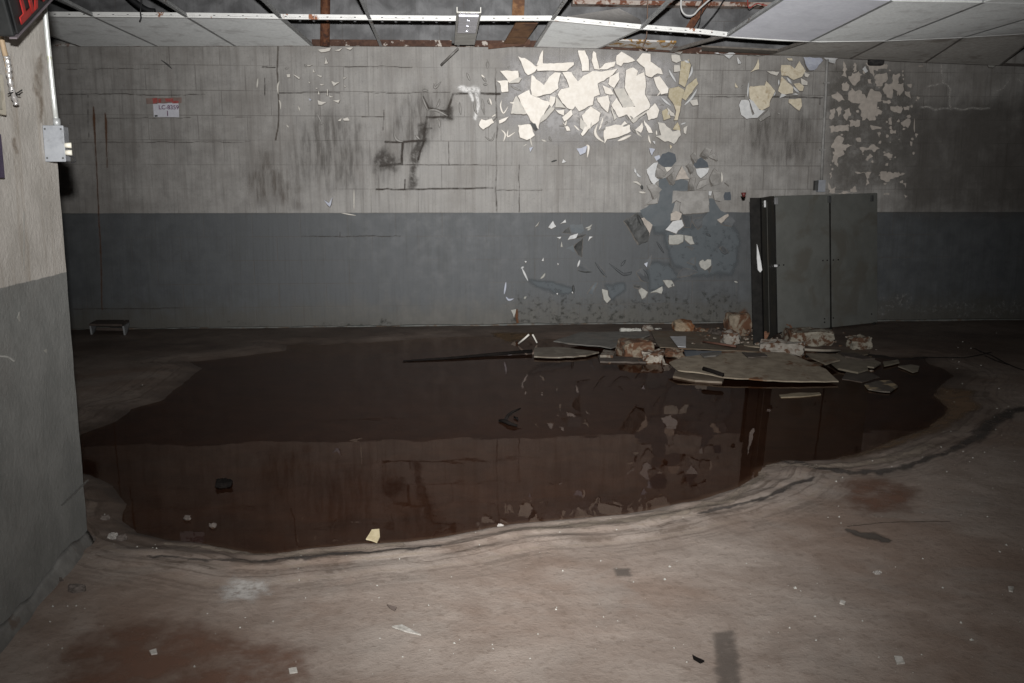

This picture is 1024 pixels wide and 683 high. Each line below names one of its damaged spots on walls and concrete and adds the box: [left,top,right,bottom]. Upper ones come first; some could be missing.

rust [93,107,107,254]
water stain [410,125,426,187]
crack [376,84,520,211]
peeling [459,39,740,303]
peeling [701,45,983,198]
peeling [504,282,527,323]